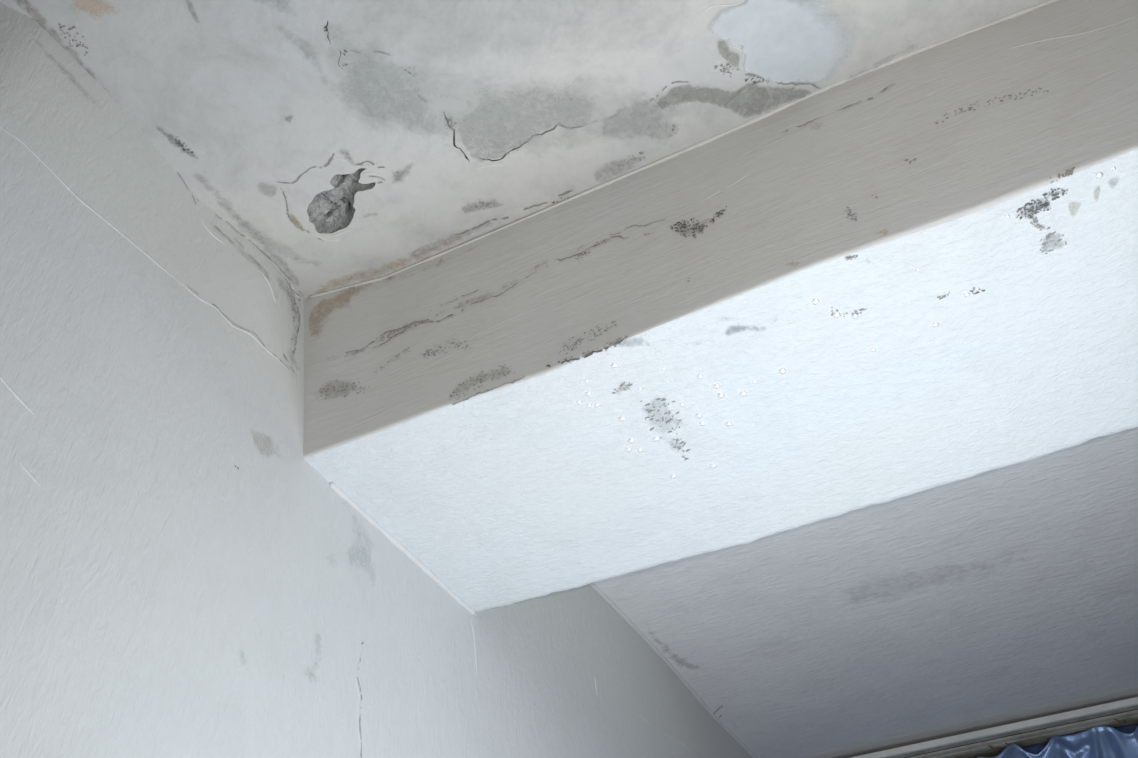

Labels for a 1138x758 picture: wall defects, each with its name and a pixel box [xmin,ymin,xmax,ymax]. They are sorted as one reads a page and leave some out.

peeling [702,0,846,89]
crack [418,95,617,170]
water stain [645,76,808,116]
flaking render [279,154,385,241]
water stain [555,206,727,264]
water stain [1017,167,1075,254]
water stain [346,271,537,353]
water stain [641,398,691,461]
crack [356,642,364,758]